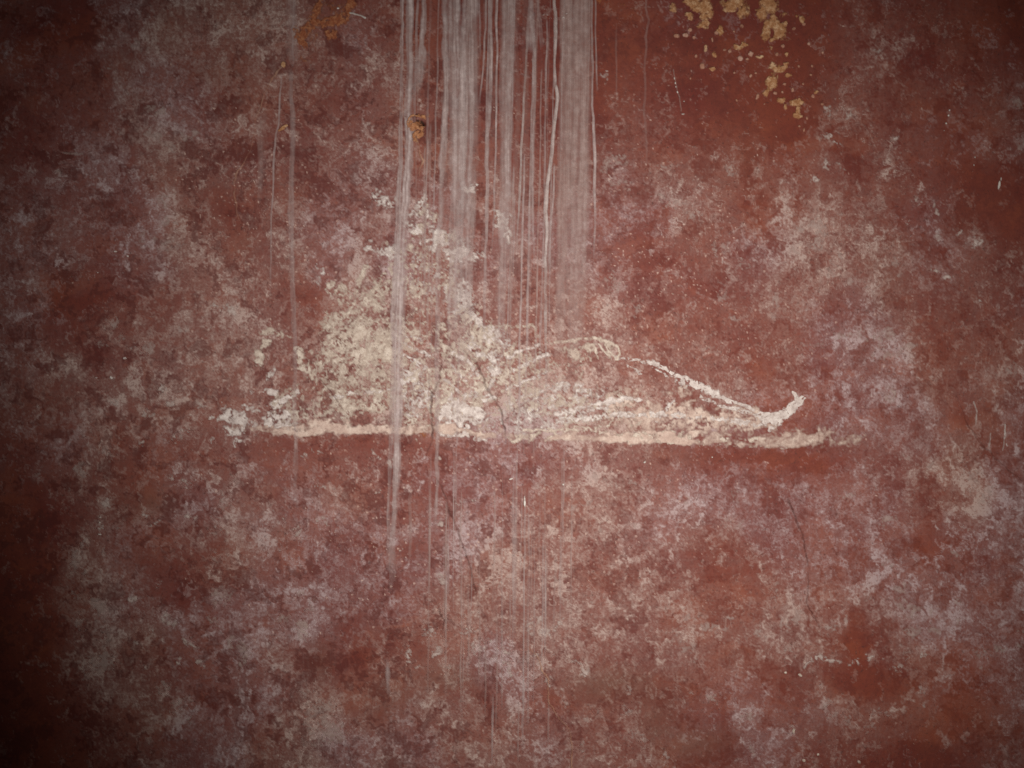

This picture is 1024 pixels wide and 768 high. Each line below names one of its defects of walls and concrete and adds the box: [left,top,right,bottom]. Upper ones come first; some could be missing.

leakage [372,0,426,495]
leakage [427,0,533,280]
leakage [532,0,623,296]
peeling [670,0,824,132]